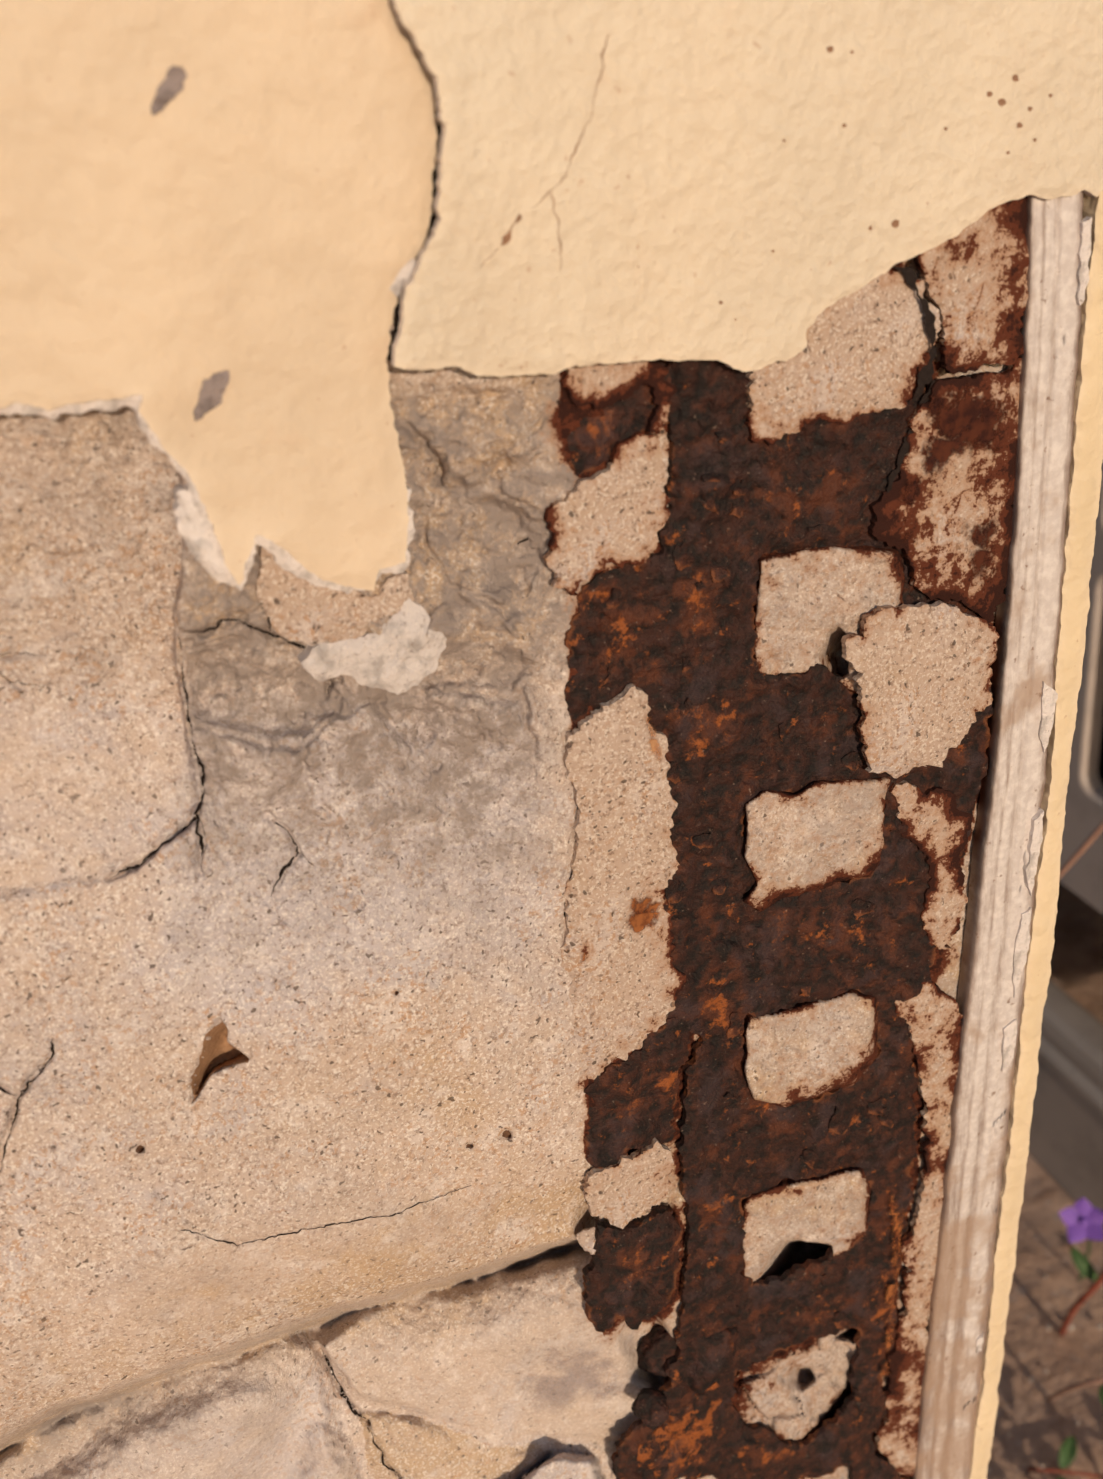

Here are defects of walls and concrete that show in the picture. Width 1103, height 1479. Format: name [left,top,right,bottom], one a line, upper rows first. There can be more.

crack [387,109,442,361]
peeling [0,0,1103,1023]
crack [110,617,306,879]
rust [564,359,1006,1479]
crack [0,1039,55,1171]
spalling [742,989,879,1107]
crack [182,1185,471,1246]
spalling [0,1031,700,1479]
spalling [741,1167,871,1282]
crack [320,1348,400,1479]
spalling [731,1328,857,1441]
spalling [803,1465,850,1479]